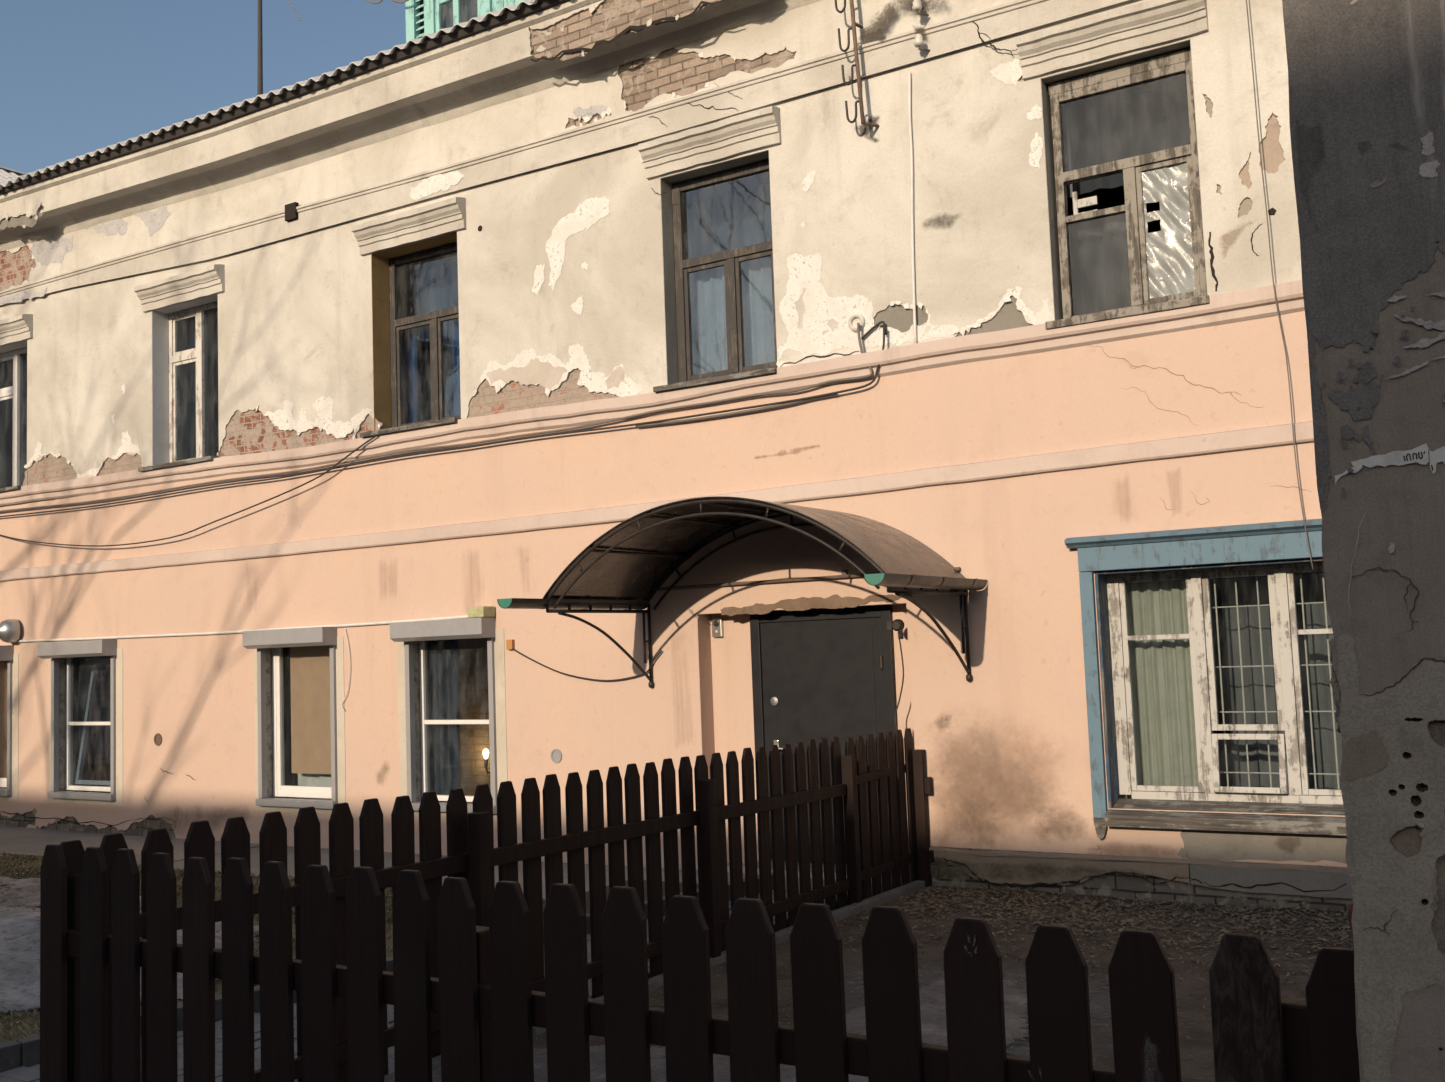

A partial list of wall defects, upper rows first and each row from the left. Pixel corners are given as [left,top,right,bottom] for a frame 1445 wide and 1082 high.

spalling [567,48,796,128]
peeling [410,171,465,201]
spalling [1238,114,1285,218]
spalling [0,205,171,304]
peeling [532,196,610,296]
peeling [571,295,583,315]
peeling [776,253,1052,367]
spalling [468,344,643,418]
crack [1089,345,1261,424]
spalling [23,414,144,486]
spalling [217,396,382,457]
peeling [1329,634,1445,1082]